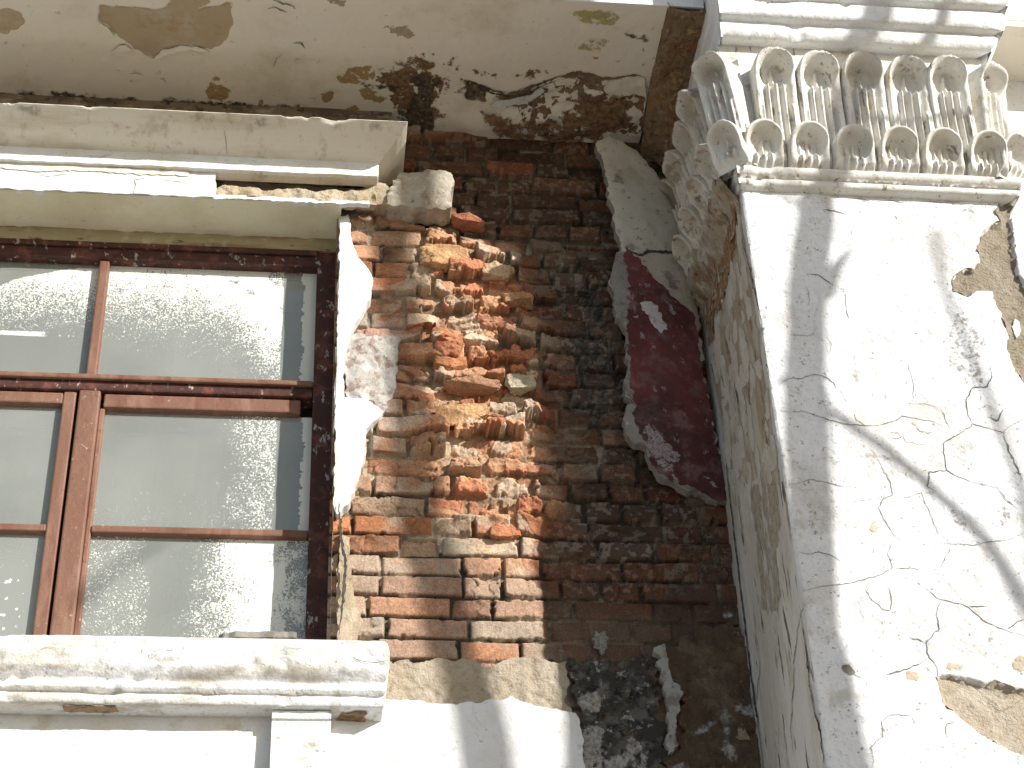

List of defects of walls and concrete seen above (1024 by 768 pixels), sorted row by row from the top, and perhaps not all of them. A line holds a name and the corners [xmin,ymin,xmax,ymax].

peeling [97,0,233,60]
flaking render [460,71,647,143]
spalling [419,212,485,273]
flaking render [952,204,1024,383]
flaking render [344,333,401,417]
spalling [432,327,536,426]
peeling [704,212,781,612]
crack [736,220,1024,766]
flaking render [336,530,363,640]
flaking render [386,657,572,712]
leakage [565,654,671,768]
flaking render [937,662,1024,755]